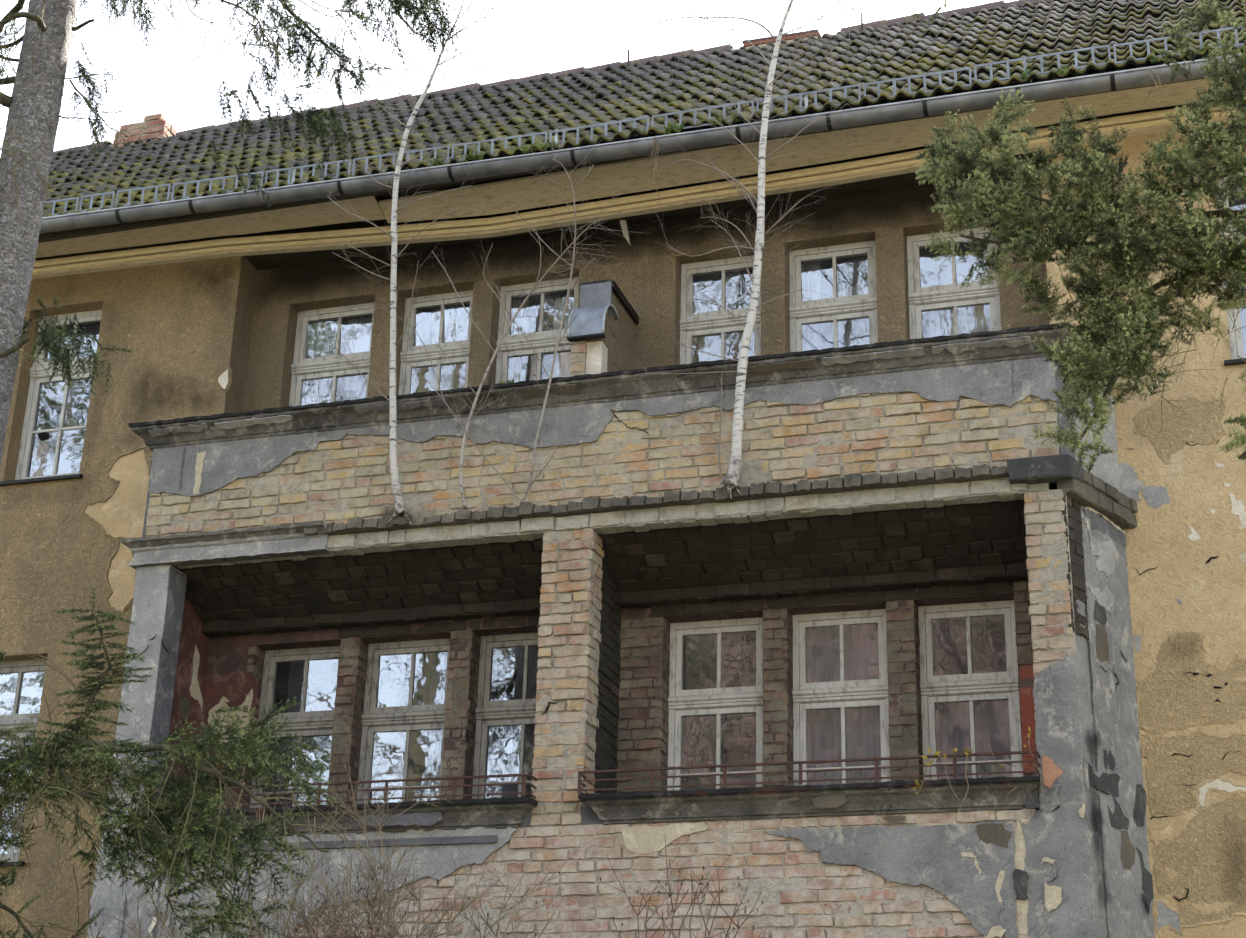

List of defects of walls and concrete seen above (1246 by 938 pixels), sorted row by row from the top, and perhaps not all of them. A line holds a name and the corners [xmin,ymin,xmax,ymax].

flaking render [215,366,232,393]
spalling [82,391,1060,615]
flaking render [1224,483,1246,529]
peeling [187,640,257,794]
flaking render [1038,756,1063,788]
flaking render [1079,631,1246,938]
spalling [289,794,1037,938]
flaking render [1044,882,1062,912]